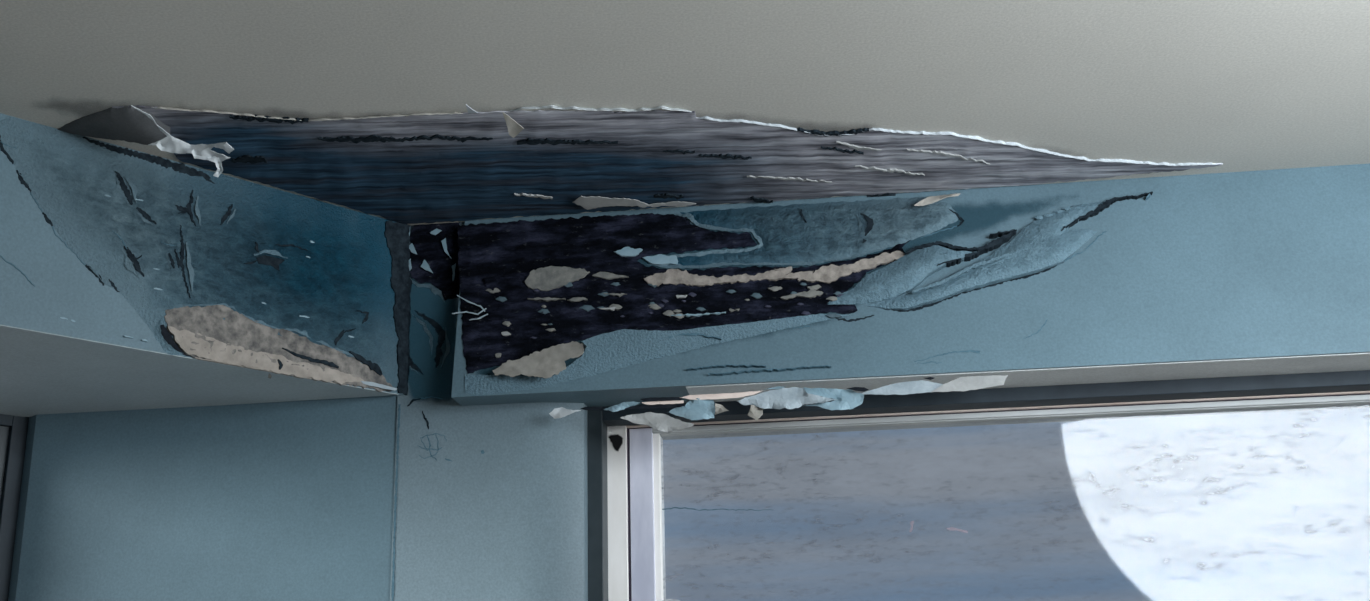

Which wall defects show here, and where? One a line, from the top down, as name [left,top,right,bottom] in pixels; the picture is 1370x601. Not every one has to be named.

crack [0,135,120,292]
crack [83,137,215,298]
peeling [112,104,1223,396]
peeling [549,375,1008,433]